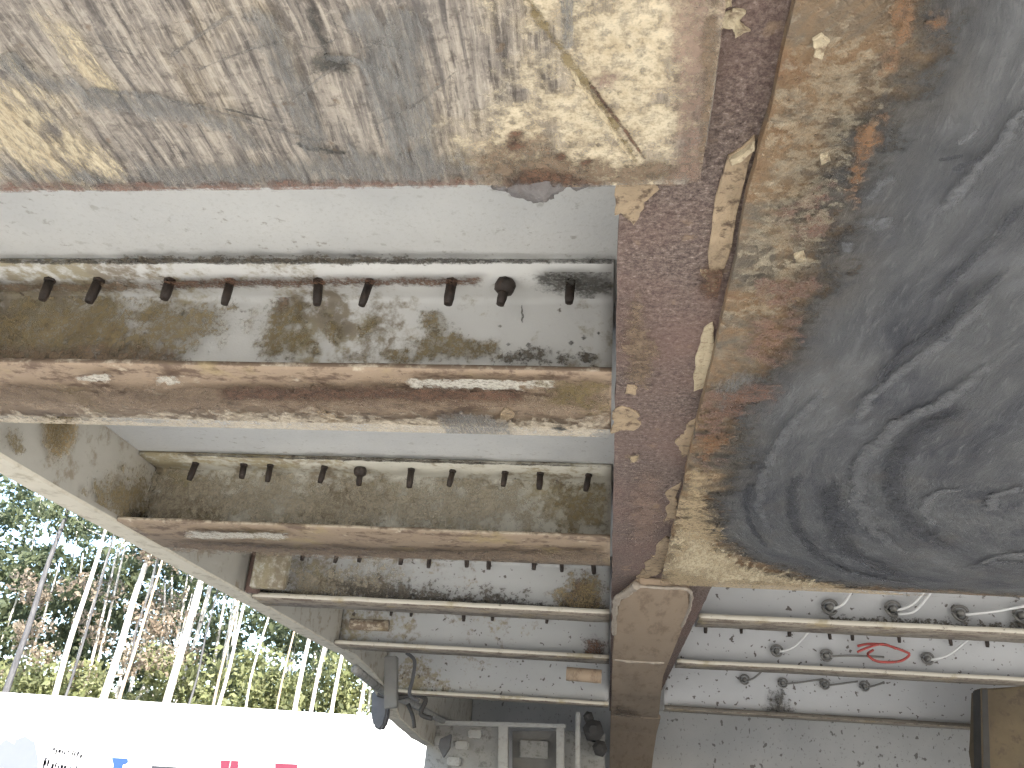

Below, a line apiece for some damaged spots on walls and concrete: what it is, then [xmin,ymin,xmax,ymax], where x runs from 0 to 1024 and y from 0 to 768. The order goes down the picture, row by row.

corrosion [848,115,890,208]
leakage [940,111,1023,210]
peeling [699,135,755,300]
leakage [491,332,600,367]
peeling [693,322,714,391]
leakage [855,270,1008,420]
peeling [675,419,695,458]
corrosion [693,384,785,472]
leakage [743,394,822,548]
leakage [785,365,996,586]